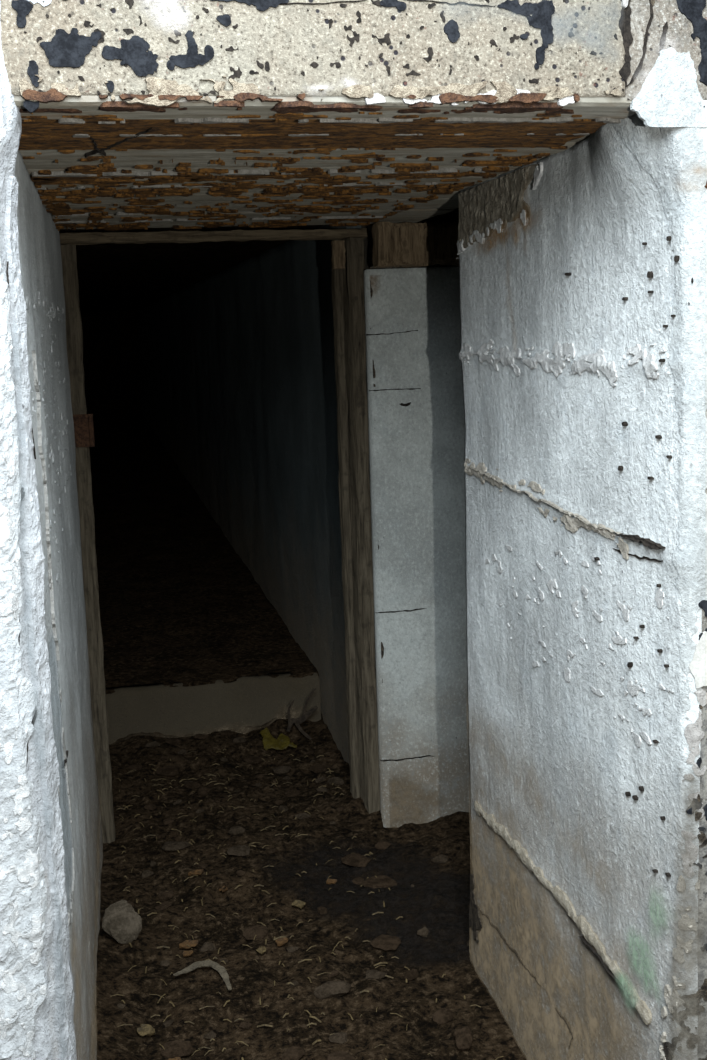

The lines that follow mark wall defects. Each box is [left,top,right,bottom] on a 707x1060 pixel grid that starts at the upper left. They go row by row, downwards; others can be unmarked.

spalling [11,0,289,113]
spalling [301,0,580,105]
rust [18,101,607,231]
peeling [596,0,707,781]
crack [21,351,60,661]
crack [464,458,666,562]
spalling [652,791,707,892]
spalling [659,976,707,1060]